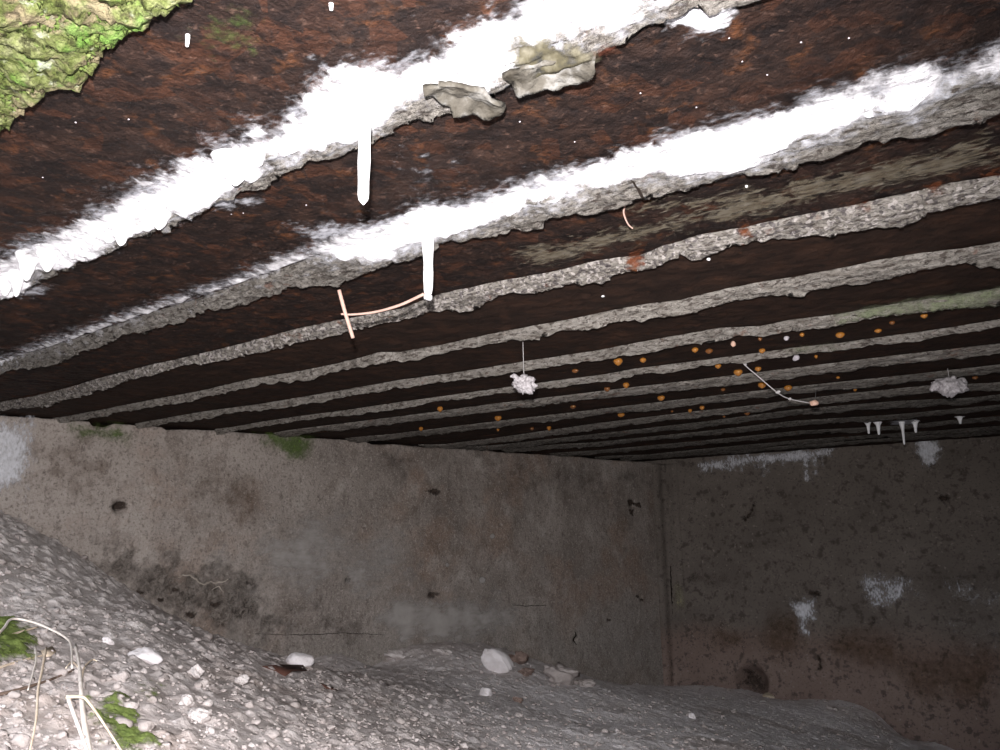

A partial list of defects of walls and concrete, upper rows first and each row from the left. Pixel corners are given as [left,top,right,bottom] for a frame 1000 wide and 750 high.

leakage [666,7,734,33]
leakage [0,0,637,300]
leakage [0,52,1000,364]
peeling [514,132,1000,266]
leakage [701,448,833,480]
leakage [918,441,939,465]
leakage [865,578,903,605]
leakage [794,601,814,634]